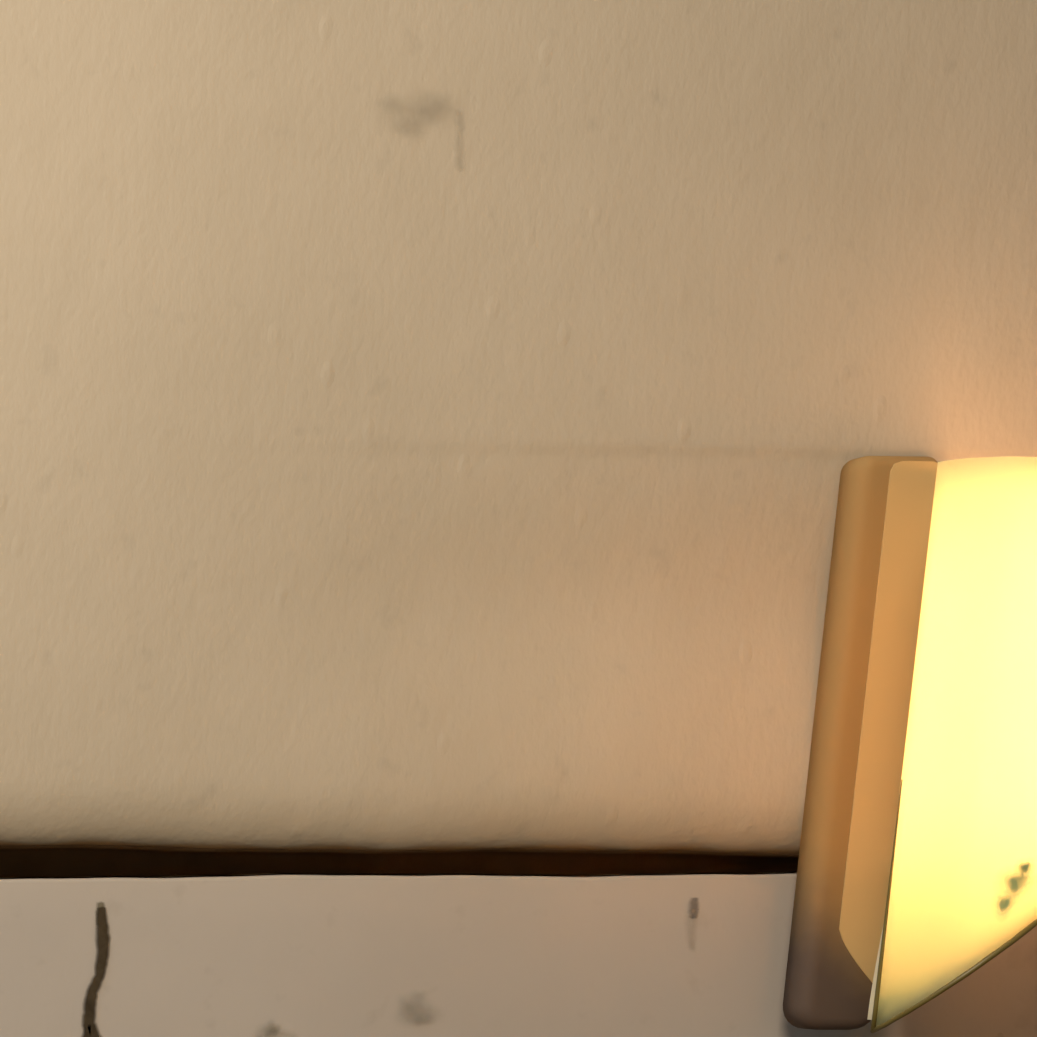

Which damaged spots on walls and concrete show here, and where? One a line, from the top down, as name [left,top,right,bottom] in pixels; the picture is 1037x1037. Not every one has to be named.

crack [83,902,110,1037]